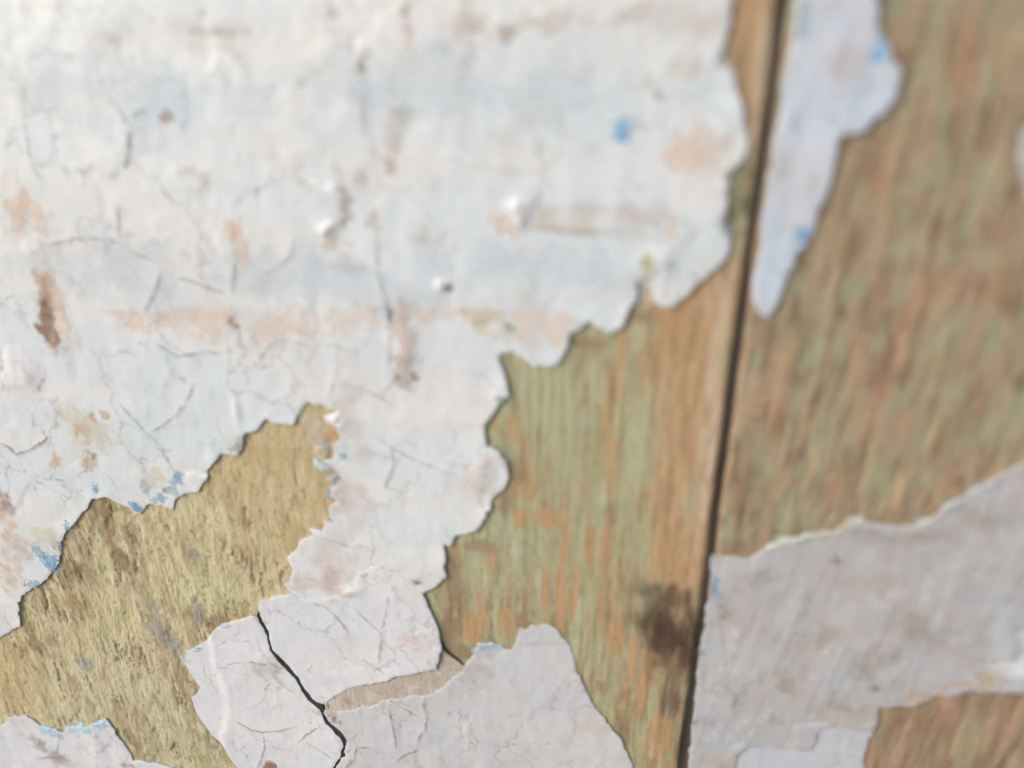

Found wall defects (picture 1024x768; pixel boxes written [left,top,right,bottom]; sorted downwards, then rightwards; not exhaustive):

peeling [0,0,780,768]
peeling [714,0,1024,558]
crack [260,622,347,768]
peeling [734,691,1024,768]